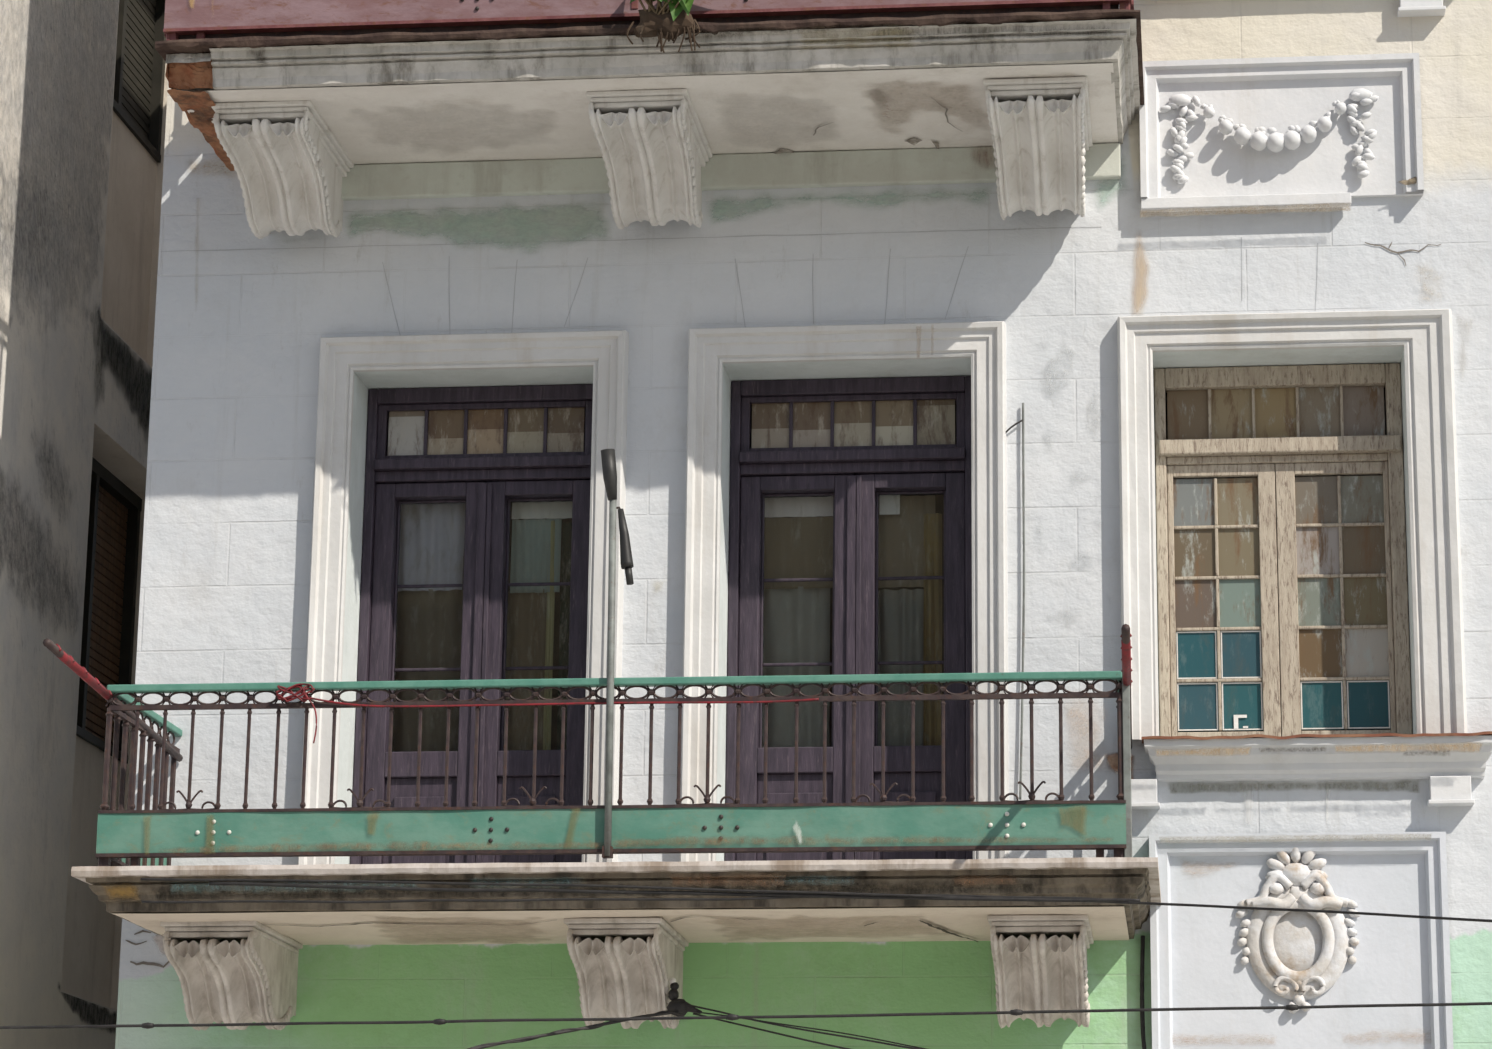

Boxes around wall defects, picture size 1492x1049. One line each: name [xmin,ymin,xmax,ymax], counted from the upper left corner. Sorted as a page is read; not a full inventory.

spalling [165,53,235,171]
leakage [1135,245,1146,310]
crack [1365,242,1441,266]
leakage [94,311,152,431]
leakage [158,882,1031,899]